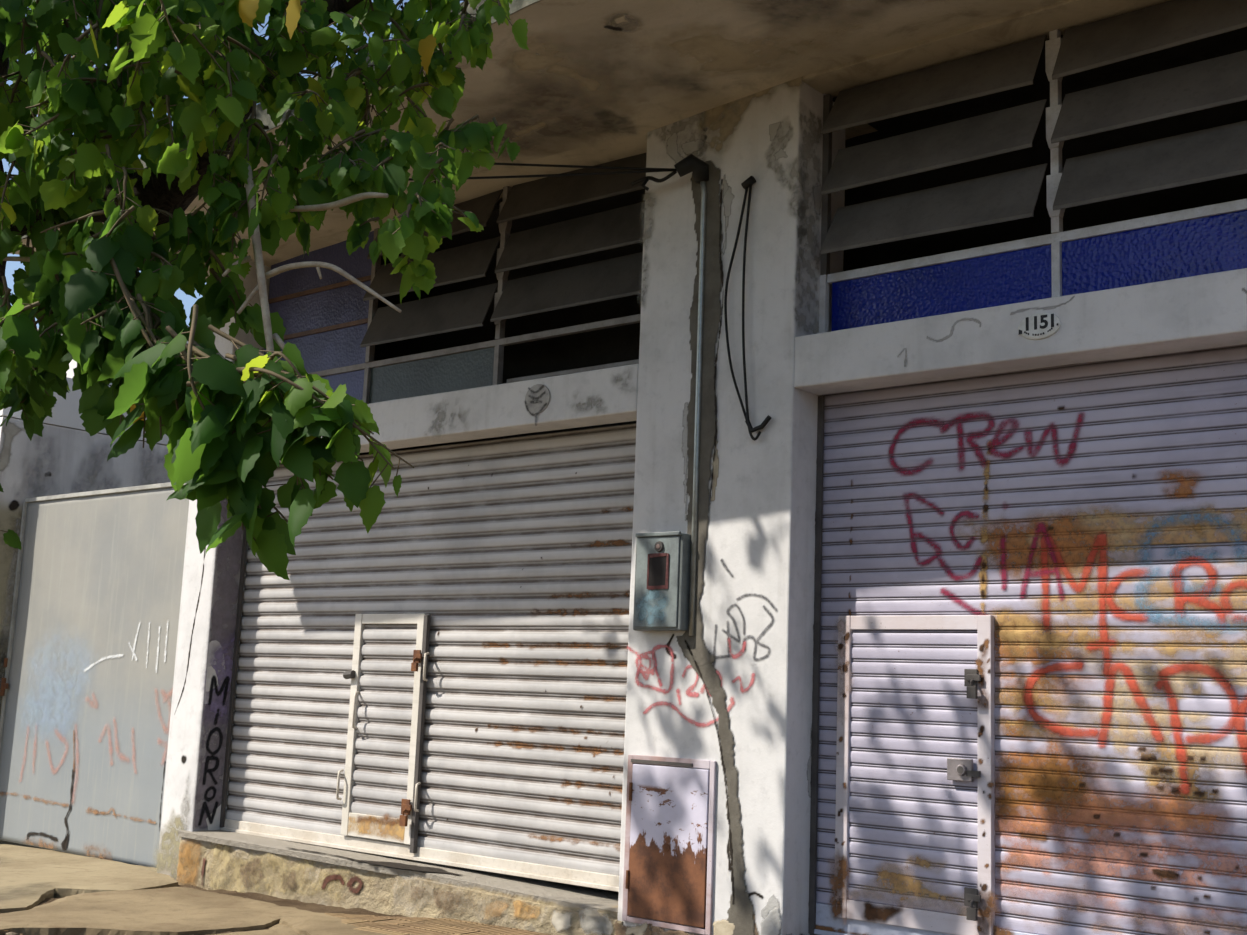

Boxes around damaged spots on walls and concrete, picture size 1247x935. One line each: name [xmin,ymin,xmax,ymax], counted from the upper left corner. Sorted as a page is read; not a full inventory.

damp [481,43,605,153]
damp [700,77,803,155]
rust [483,642,627,667]
rust [531,591,630,616]
rust [837,576,851,697]
rust [972,441,1247,935]
rust [349,814,405,840]
rust [475,724,624,809]
crack [665,634,763,935]
rust [815,838,947,935]